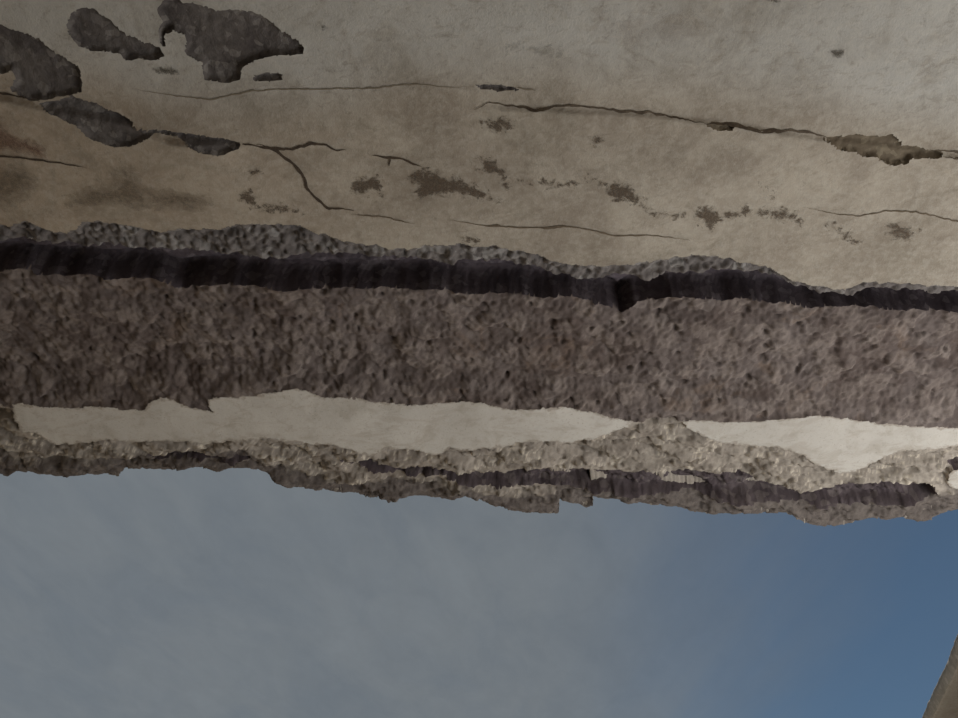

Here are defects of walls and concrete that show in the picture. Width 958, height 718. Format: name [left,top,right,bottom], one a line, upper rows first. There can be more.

peeling [66,0,304,83]
crack [0,155,85,168]
peeling [0,24,240,157]
crack [237,142,421,224]
crack [138,84,830,139]
spalling [707,123,734,131]
spalling [823,134,943,166]
crack [454,220,690,241]
crack [804,207,958,222]
spalling [0,220,958,527]